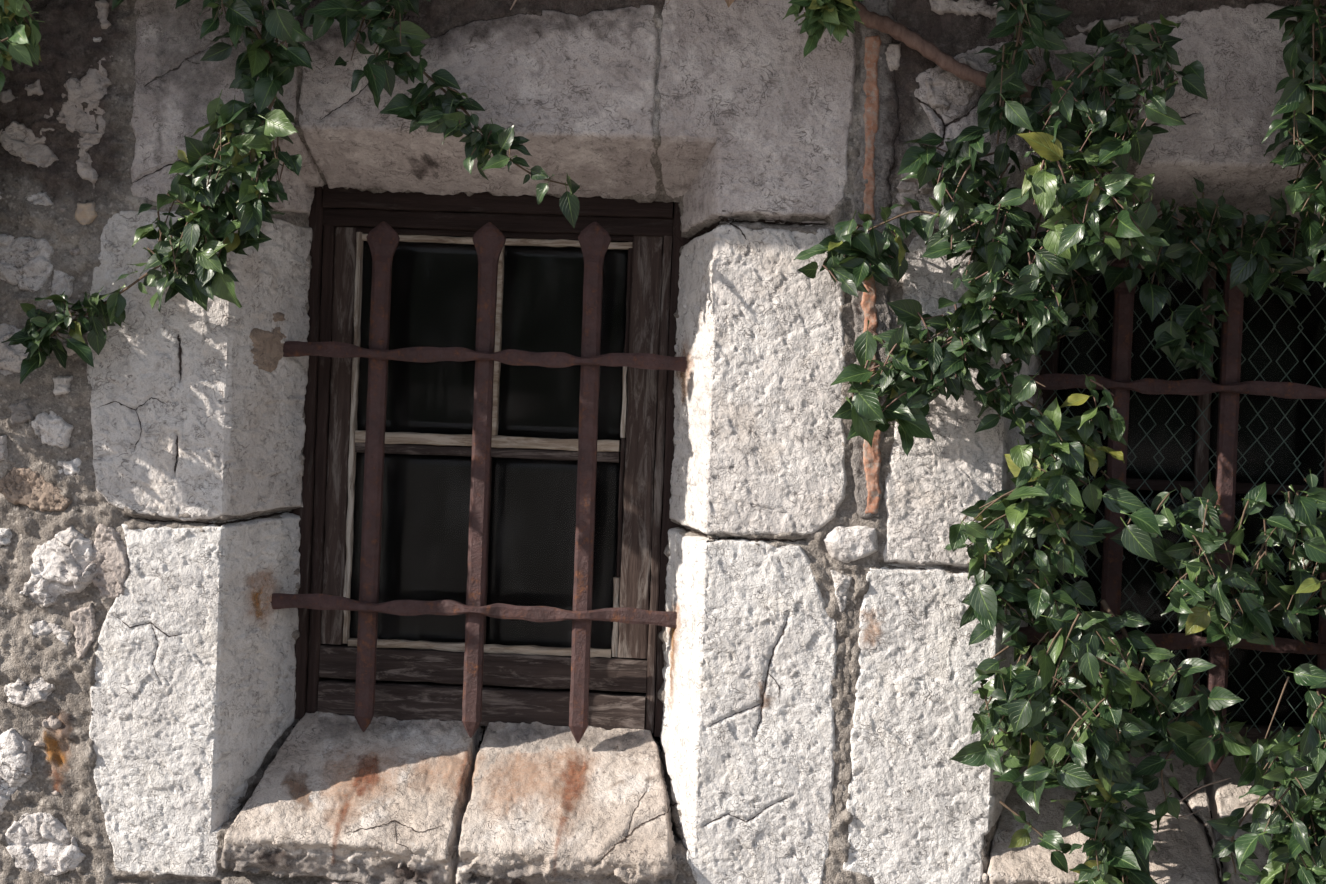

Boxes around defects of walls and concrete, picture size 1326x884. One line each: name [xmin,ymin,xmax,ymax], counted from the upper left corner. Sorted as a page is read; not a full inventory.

peeling [0,0,113,189]
crack [98,334,182,447]
crack [172,436,180,472]
crack [709,611,790,736]
spalling [34,715,62,748]
corrosion [333,751,388,862]
corrosion [494,751,586,839]
crack [594,788,680,866]
crack [707,796,791,824]